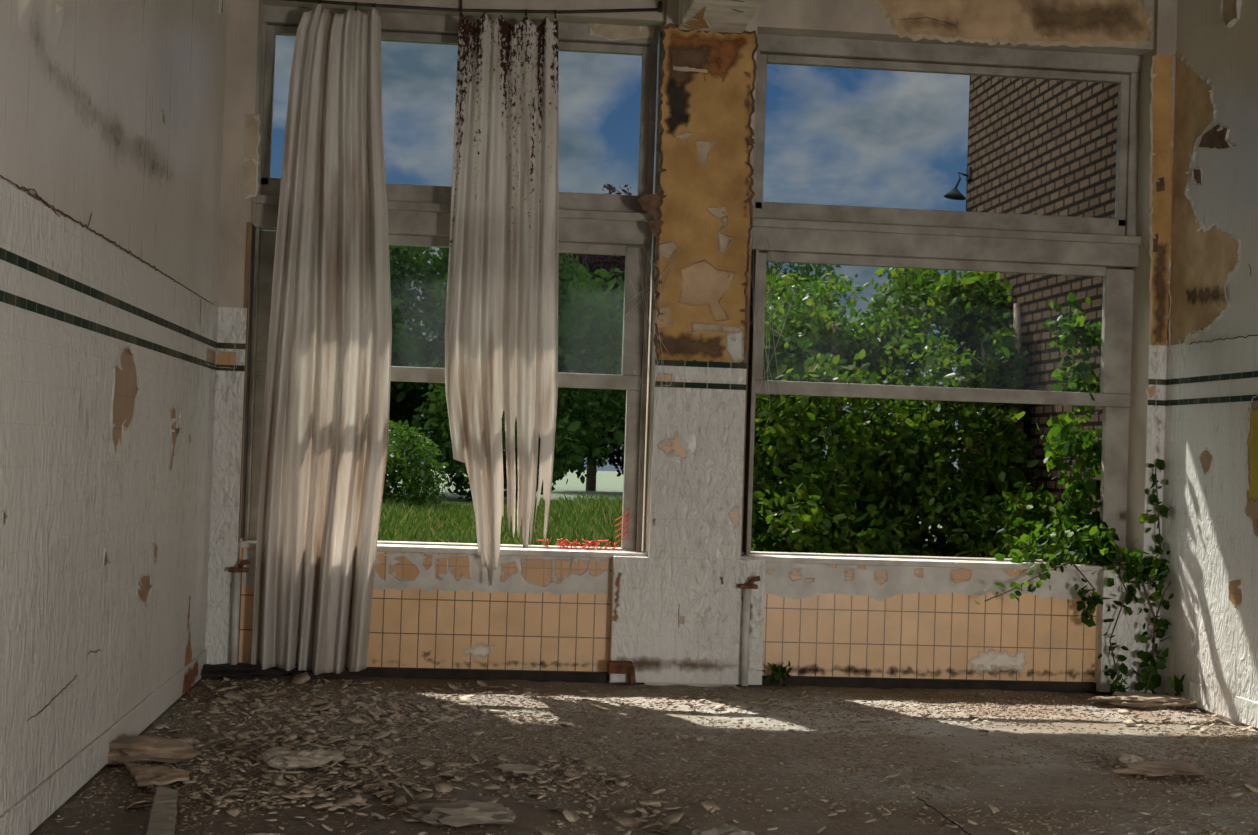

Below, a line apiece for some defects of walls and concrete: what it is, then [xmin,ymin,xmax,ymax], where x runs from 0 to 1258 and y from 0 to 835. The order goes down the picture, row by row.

peeling [871,0,1242,346]
spalling [587,4,758,551]
peeling [109,345,139,464]
peeling [168,405,191,473]
peeling [1199,447,1214,476]
peeling [1244,395,1258,538]
peeling [373,552,612,595]
peeling [765,562,1098,601]